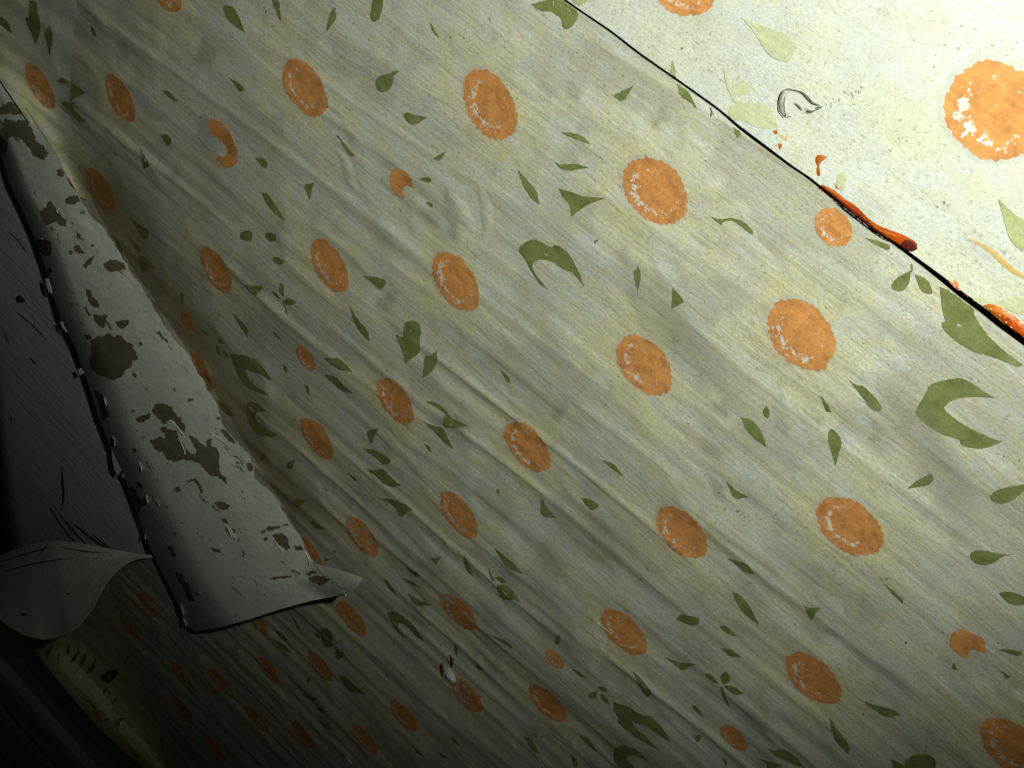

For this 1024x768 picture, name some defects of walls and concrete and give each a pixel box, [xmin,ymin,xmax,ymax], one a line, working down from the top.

peeling [0,81,364,640]
crack [564,0,1024,346]
corrosion [816,155,917,251]